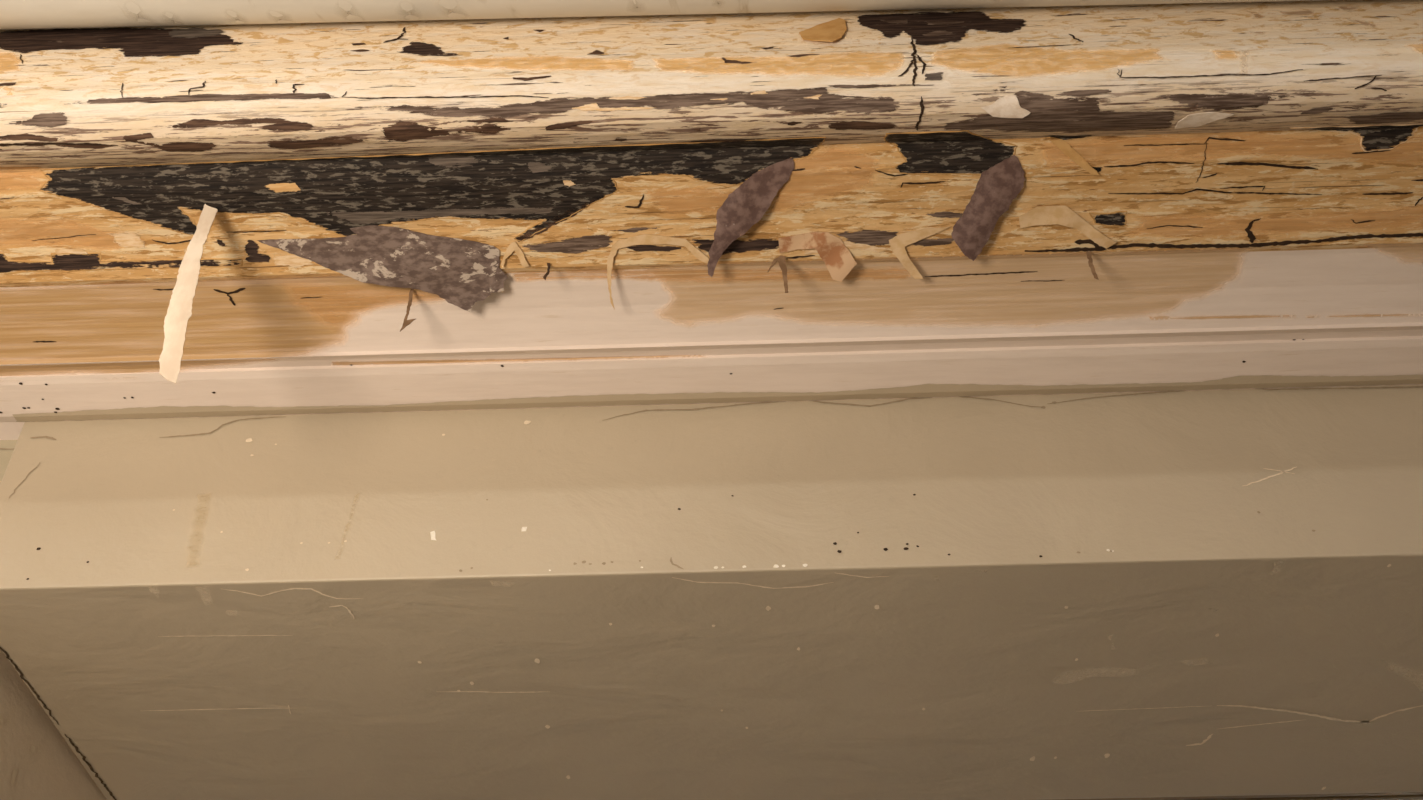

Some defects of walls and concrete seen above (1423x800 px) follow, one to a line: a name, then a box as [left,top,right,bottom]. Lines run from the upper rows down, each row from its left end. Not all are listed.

peeling [0,28,243,57]
peeling [401,42,457,56]
peeling [790,11,1026,57]
crack [899,38,927,131]
peeling [925,72,943,81]
peeling [0,84,1423,383]
crack [160,416,281,438]
crack [0,436,56,498]
crack [0,647,117,800]